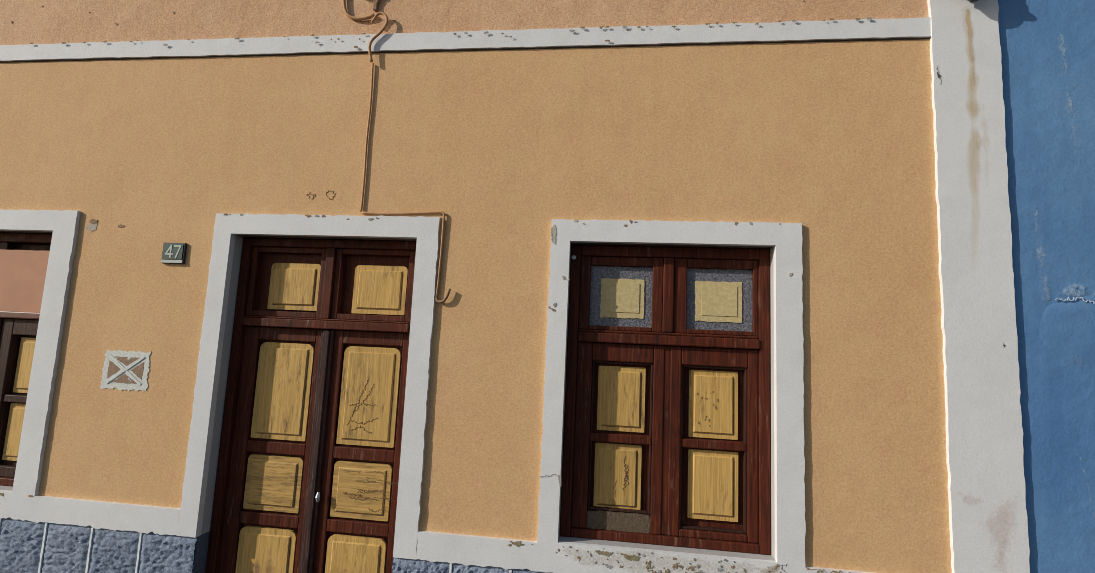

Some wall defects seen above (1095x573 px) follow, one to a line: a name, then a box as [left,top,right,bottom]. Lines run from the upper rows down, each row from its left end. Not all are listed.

peeling [586,509,650,534]
peeling [555,546,746,573]